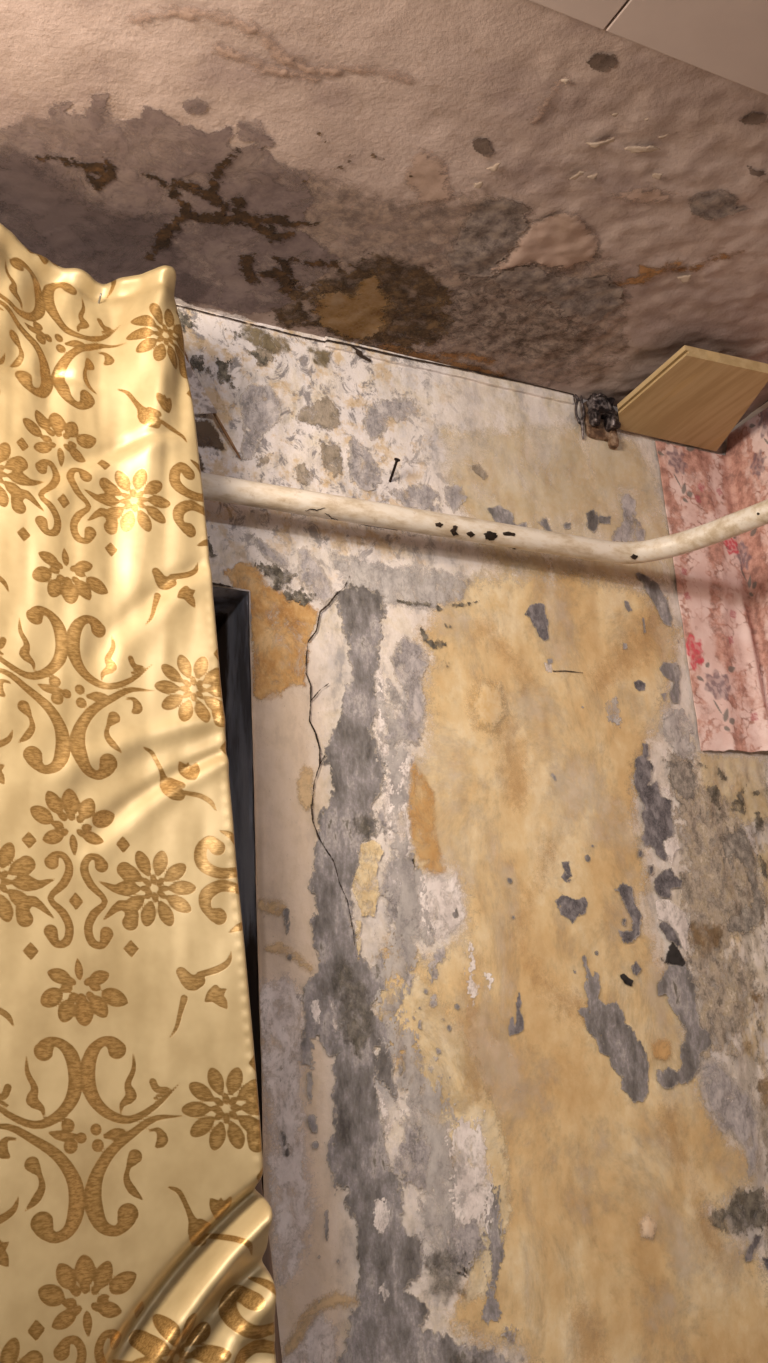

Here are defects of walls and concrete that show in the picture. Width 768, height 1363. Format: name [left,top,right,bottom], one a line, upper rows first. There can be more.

leakage [0,93,631,389]
peeling [404,151,454,207]
peeling [446,138,627,362]
peeling [586,134,668,153]
leakage [454,432,669,542]
crack [305,576,357,957]
peeling [252,535,524,1363]
leakage [258,544,768,1363]
spalling [573,662,768,1177]
spalling [745,1225,768,1272]